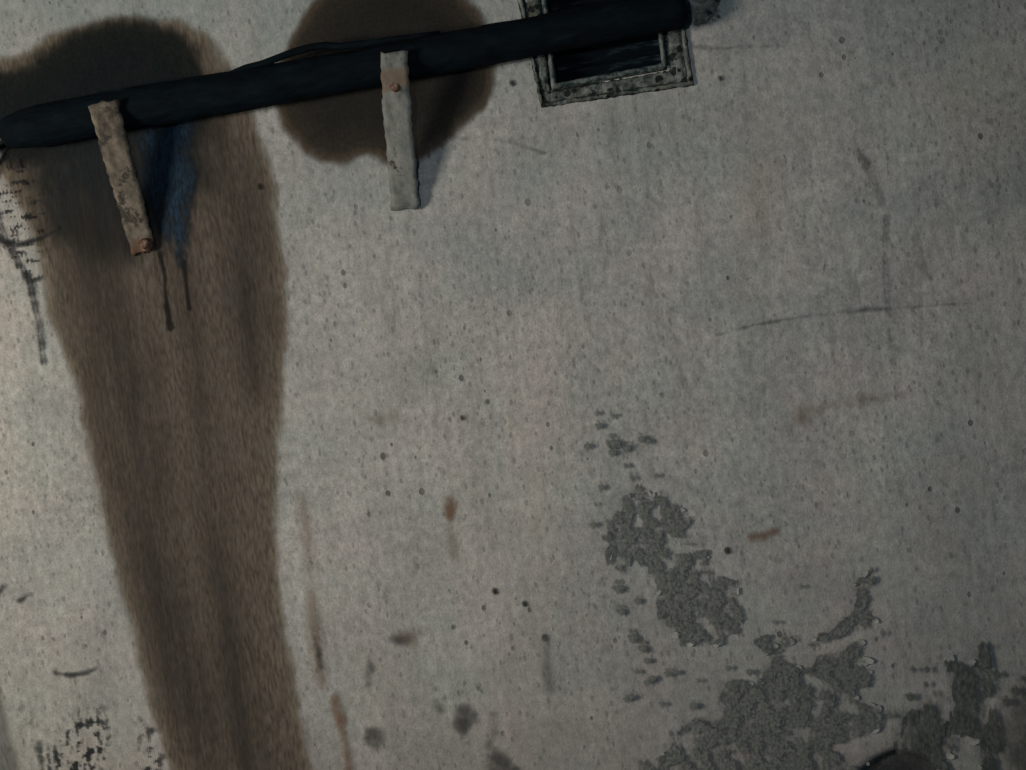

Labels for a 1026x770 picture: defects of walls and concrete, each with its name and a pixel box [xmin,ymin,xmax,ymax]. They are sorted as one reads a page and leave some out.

leakage [0,18,230,120]
leakage [277,86,388,164]
leakage [281,0,484,62]
leakage [410,65,494,160]
crack [0,144,57,365]
leakage [0,111,309,770]
peeling [590,410,744,647]
peeling [628,629,679,686]
peeling [638,568,1026,770]